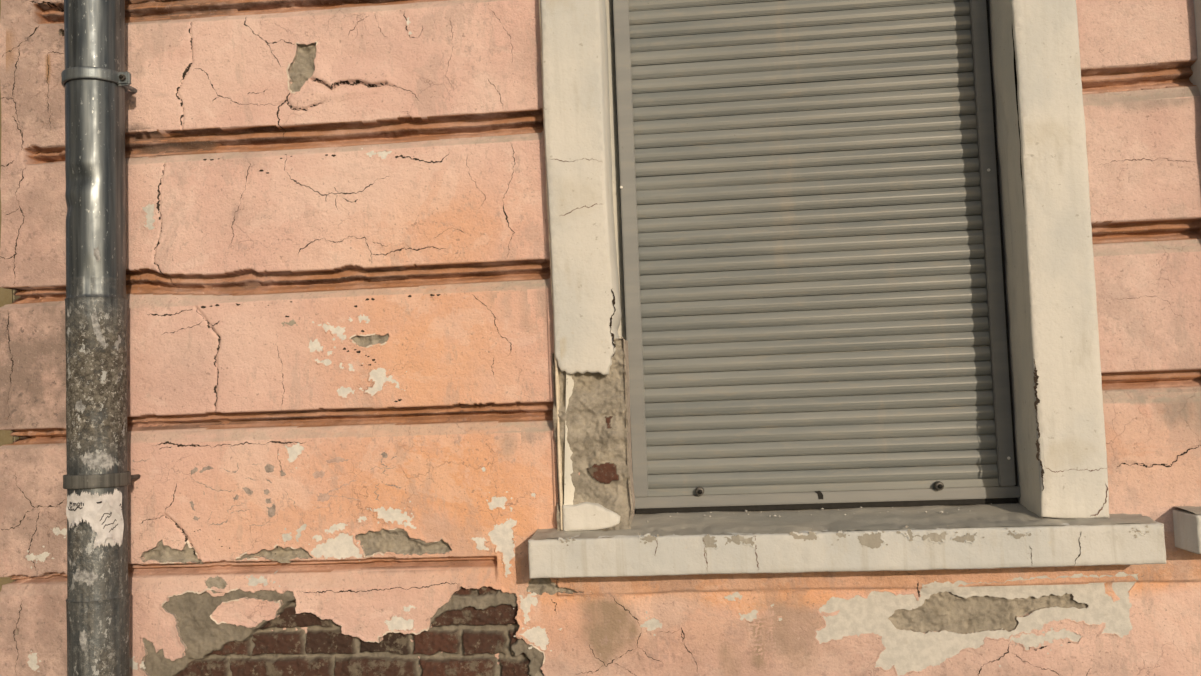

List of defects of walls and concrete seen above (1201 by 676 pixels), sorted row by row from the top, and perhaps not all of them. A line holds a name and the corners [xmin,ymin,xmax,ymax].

crack [0,0,64,420]
crack [1,476,66,568]
crack [147,165,221,411]
crack [154,441,302,473]
peeling [265,442,306,476]
spalling [285,40,320,95]
crack [176,11,515,261]
peeling [309,298,407,402]
spalling [129,487,589,676]
spalling [552,337,659,546]
peeling [814,570,1140,676]
crack [1033,359,1201,565]